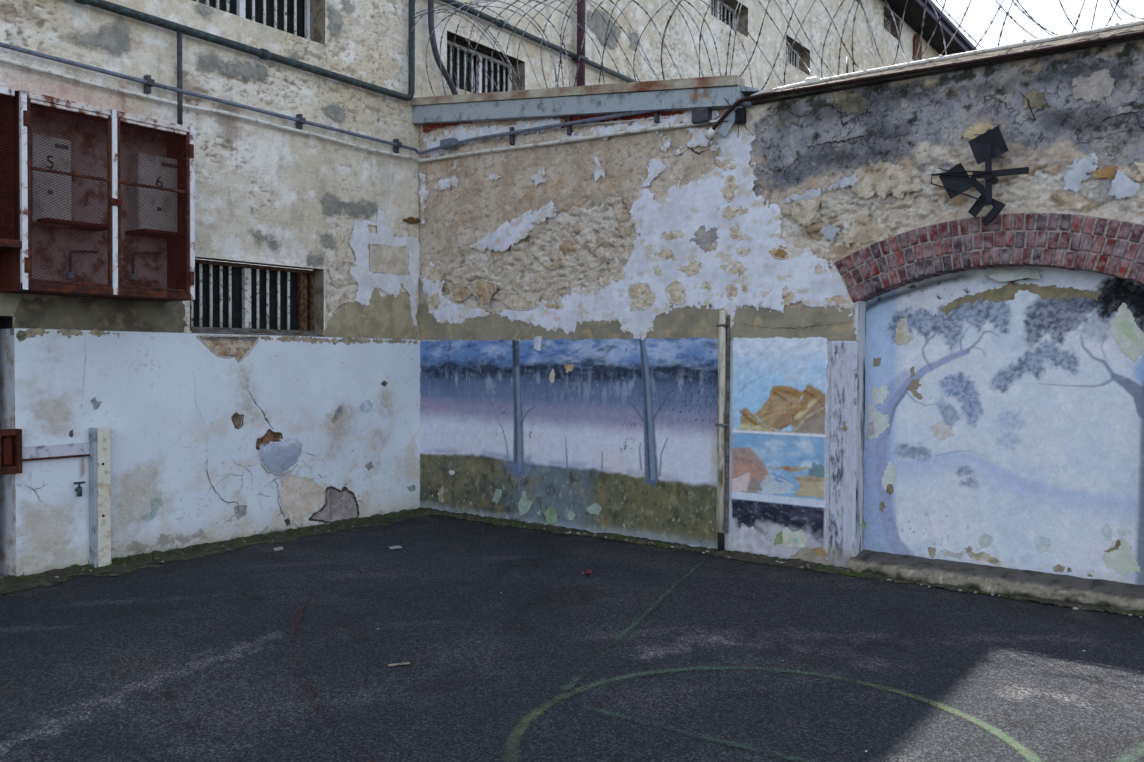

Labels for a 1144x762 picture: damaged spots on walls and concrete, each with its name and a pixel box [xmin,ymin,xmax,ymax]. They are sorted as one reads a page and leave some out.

flaking render [1072,69,1115,102]
flaking render [962,122,994,142]
flaking render [1063,153,1144,200]
flaking render [196,108,922,363]
peeling [941,267,1099,315]
peeling [867,385,890,439]
flaking render [256,429,283,450]
crack [194,368,347,527]
peeling [280,474,360,526]
peeling [879,460,897,512]
peeling [928,534,1001,567]
peeling [1101,524,1141,576]